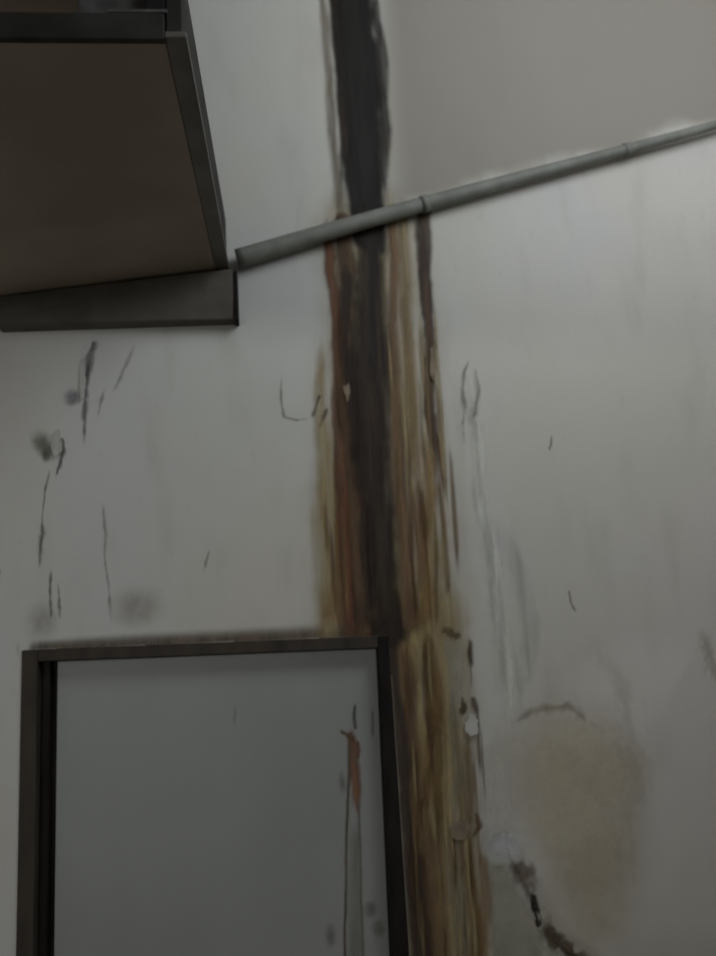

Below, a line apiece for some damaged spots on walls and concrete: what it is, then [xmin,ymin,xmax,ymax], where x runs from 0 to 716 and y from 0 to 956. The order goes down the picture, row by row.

damp [322,0,390,216]
corrosion [336,205,376,220]
crack [39,526,60,613]
corrosion [318,212,490,956]
damp [467,373,512,705]
spalling [487,863,584,956]